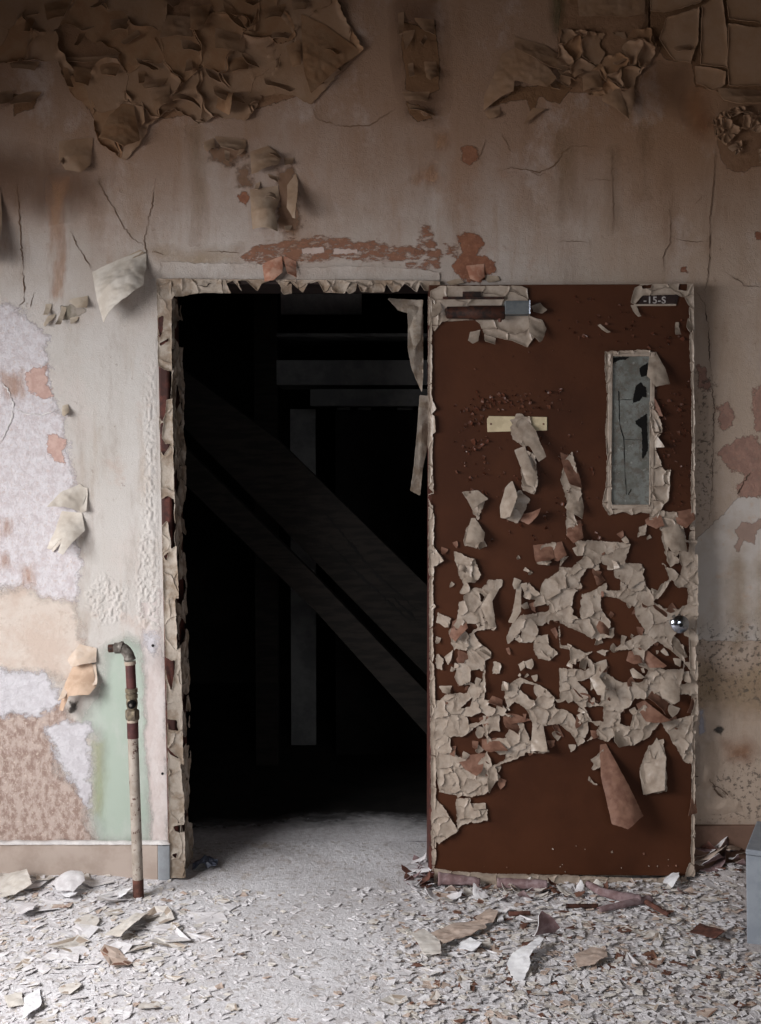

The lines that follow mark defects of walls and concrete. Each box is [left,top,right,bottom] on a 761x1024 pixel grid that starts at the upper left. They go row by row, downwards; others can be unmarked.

peeling [0,0,363,160]
flaking render [401,22,440,122]
peeling [484,0,761,172]
crack [17,188,33,309]
crack [99,183,163,266]
crack [663,157,758,364]
peeling [0,136,711,885]
crack [709,389,750,514]
flaking render [716,386,761,498]
flaking render [735,519,761,552]